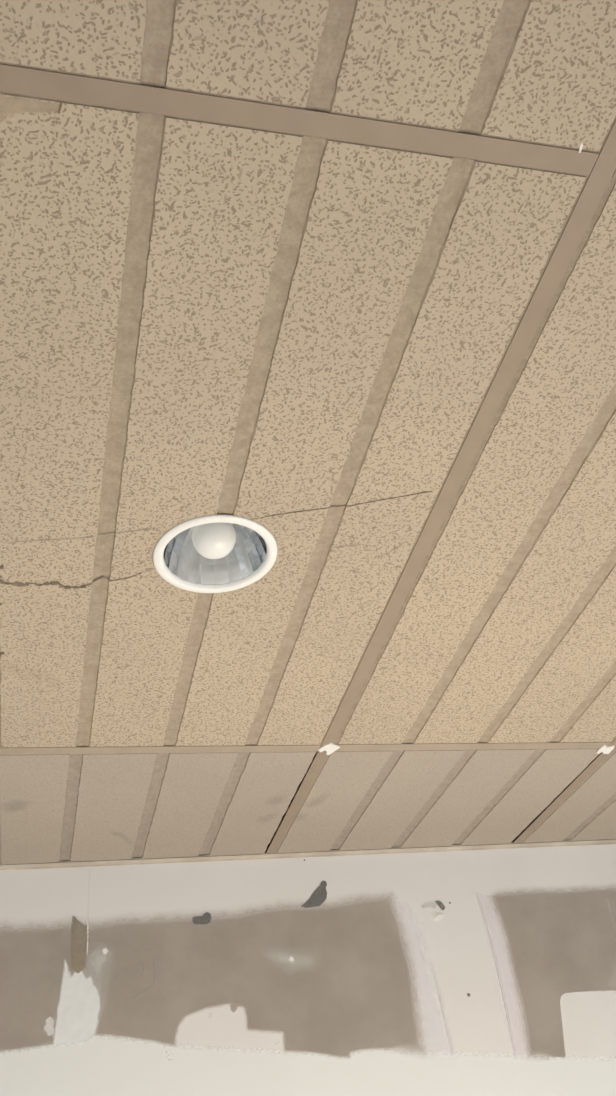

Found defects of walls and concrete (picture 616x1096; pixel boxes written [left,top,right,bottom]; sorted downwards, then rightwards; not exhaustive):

crack [254,491,433,519]
crack [12,528,157,543]
crack [0,570,151,589]